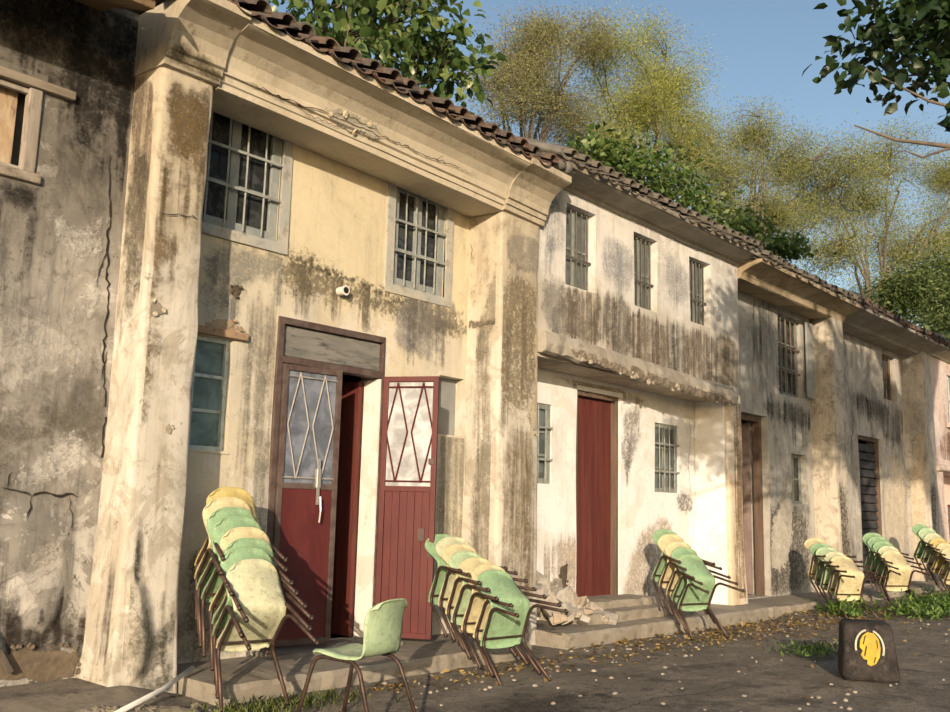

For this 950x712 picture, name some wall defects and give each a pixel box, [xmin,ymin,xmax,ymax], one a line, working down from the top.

water stain [0,0,152,308]
crack [240,81,469,173]
crack [3,157,112,530]
water stain [72,278,101,320]
water stain [208,235,718,560]
spalling [571,346,735,406]
water stain [501,433,534,599]
water stain [771,506,810,595]